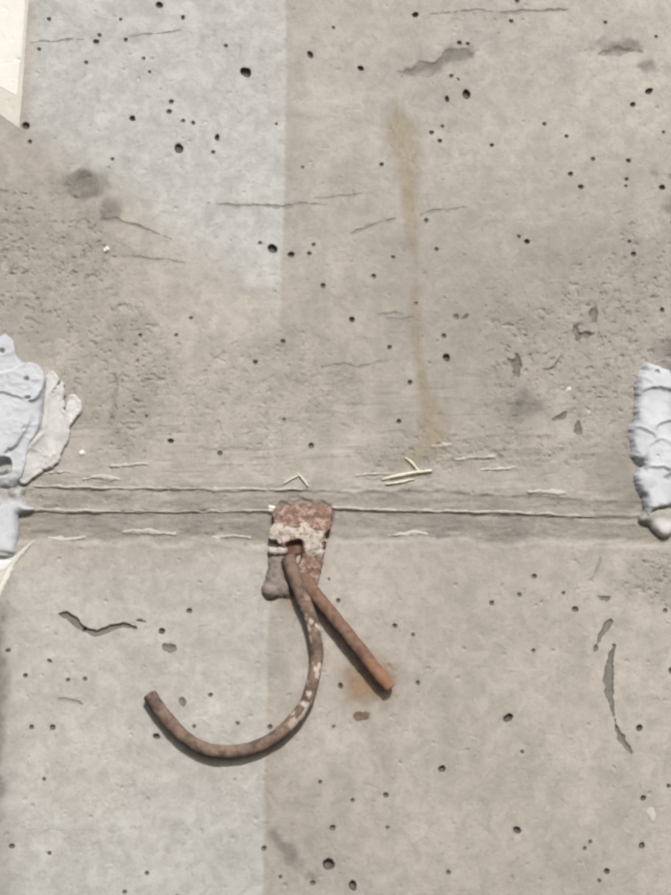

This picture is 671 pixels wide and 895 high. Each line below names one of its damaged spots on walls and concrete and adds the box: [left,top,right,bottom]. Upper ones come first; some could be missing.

crack [58,611,146,637]
corrosion [349,651,379,697]
crack [594,619,633,754]
corrosion [353,711,370,721]